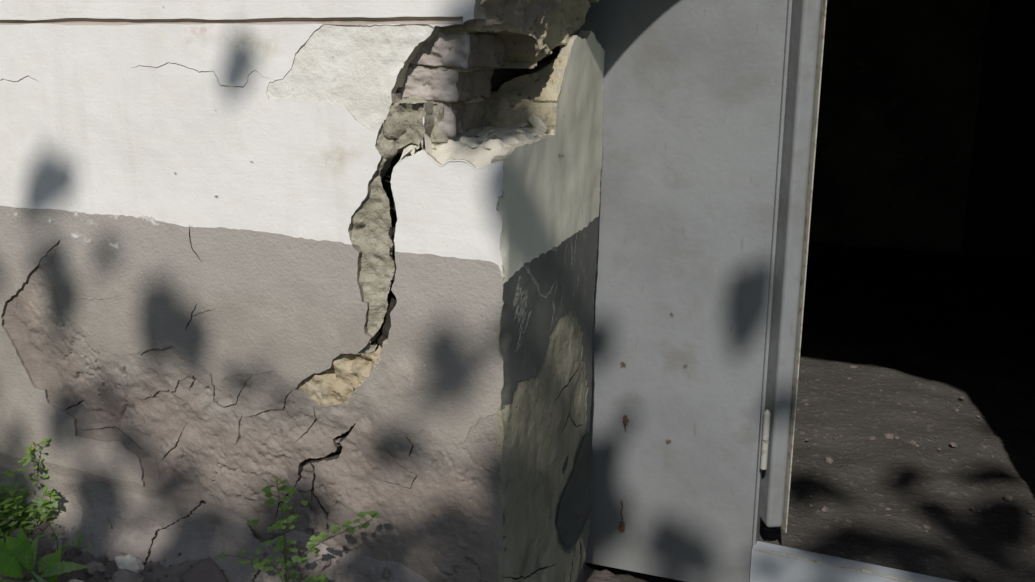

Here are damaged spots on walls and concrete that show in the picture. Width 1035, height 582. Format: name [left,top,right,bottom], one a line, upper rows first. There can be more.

crack [138,62,266,88]
peeling [267,0,591,161]
crack [141,304,215,355]
crack [84,423,187,460]
crack [142,373,292,445]
flaking render [3,243,588,582]
crack [276,410,356,529]
crack [379,435,417,489]
crack [555,365,584,433]
water stain [556,432,591,548]
crack [143,500,206,565]